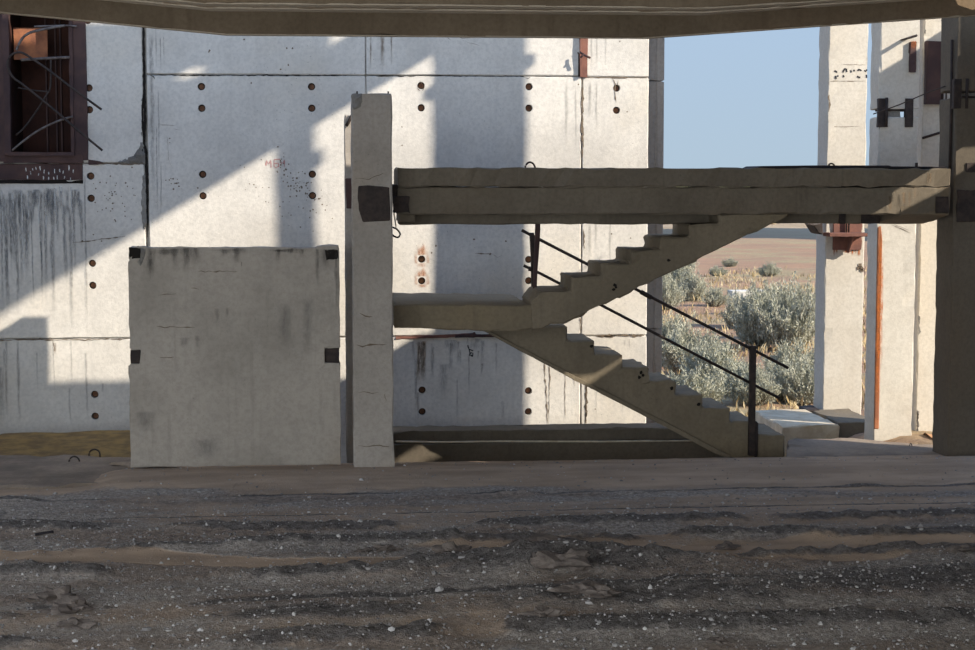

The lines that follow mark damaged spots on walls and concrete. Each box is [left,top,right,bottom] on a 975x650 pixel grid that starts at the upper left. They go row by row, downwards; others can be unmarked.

water stain [2,165,74,247]